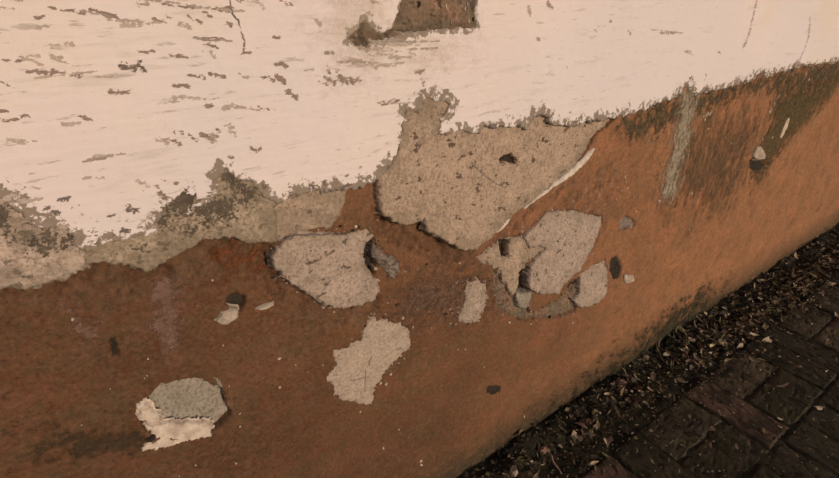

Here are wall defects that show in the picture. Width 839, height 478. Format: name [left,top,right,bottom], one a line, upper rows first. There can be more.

crack [229,0,246,55]
spalling [347,0,476,48]
peeling [0,168,347,290]
peeling [364,237,406,279]
peeling [373,97,612,328]
hole [214,293,243,325]
peeling [325,312,411,413]
spalling [135,377,228,451]